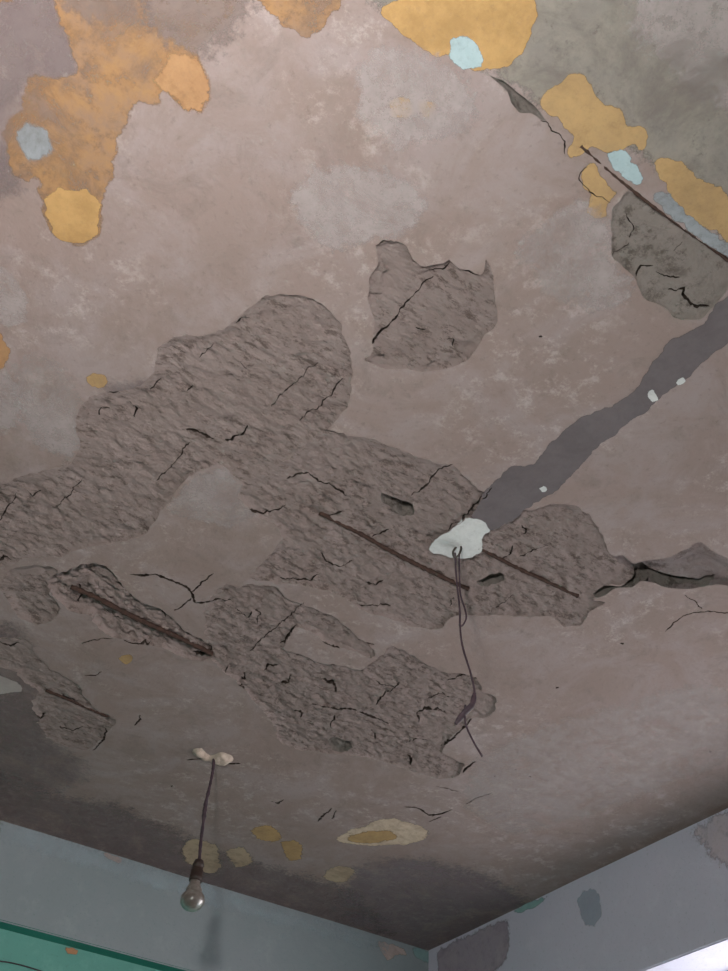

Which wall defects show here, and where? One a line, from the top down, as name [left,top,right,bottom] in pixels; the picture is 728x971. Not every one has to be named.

damp [0,0,76,107]
damp [357,49,474,149]
damp [637,0,728,67]
damp [291,166,427,248]
spalling [365,240,498,372]
spalling [0,293,728,779]
crack [130,573,231,611]
flaking render [378,897,544,971]